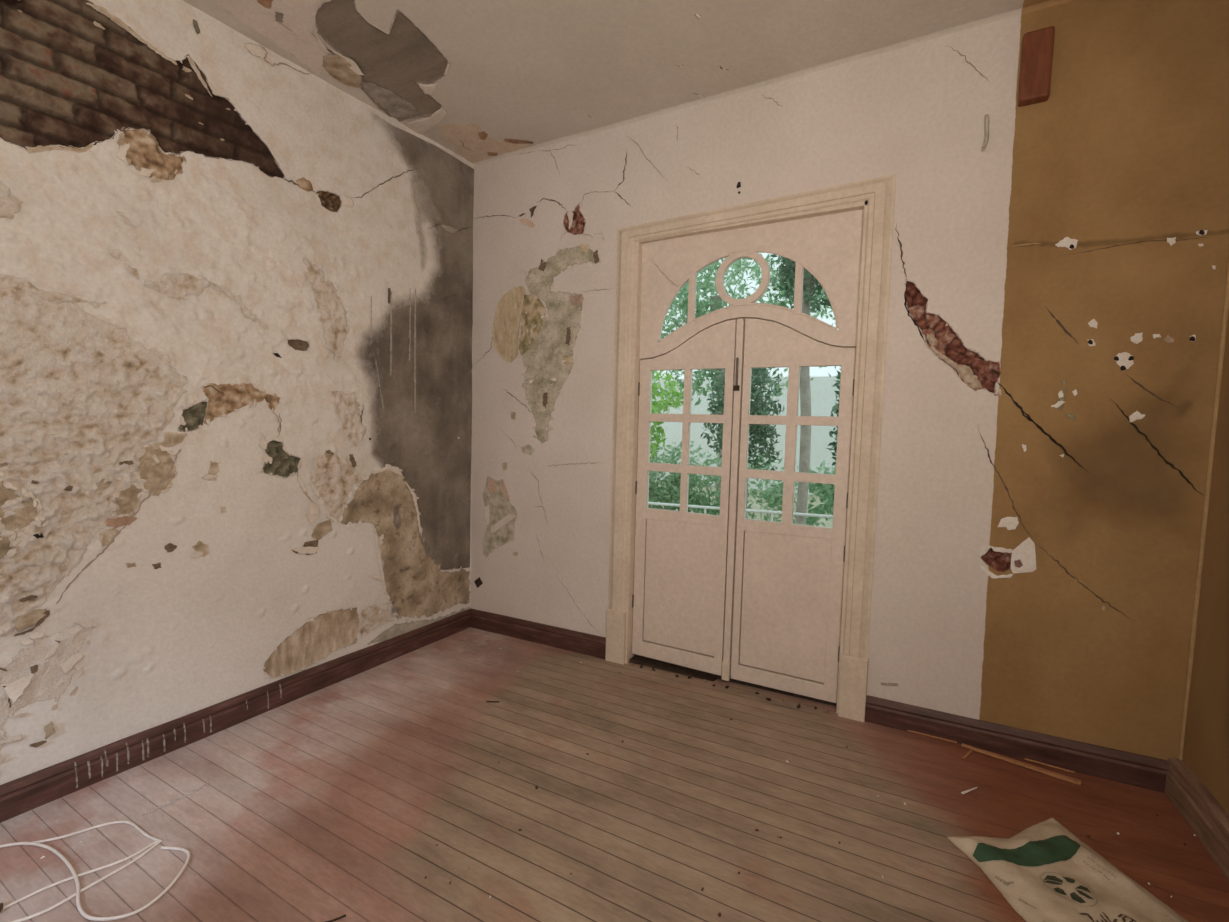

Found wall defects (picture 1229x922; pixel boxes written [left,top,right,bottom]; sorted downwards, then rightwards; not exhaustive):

spalling [0,0,354,212]
peeling [213,0,534,164]
crack [284,127,701,239]
leakage [363,126,474,570]
peeling [492,203,601,455]
crack [895,224,926,345]
spalling [904,280,1002,396]
crack [1046,307,1077,343]
crack [996,380,1085,469]
crack [1111,375,1204,496]
peeling [85,382,483,679]
spalling [978,537,1037,579]